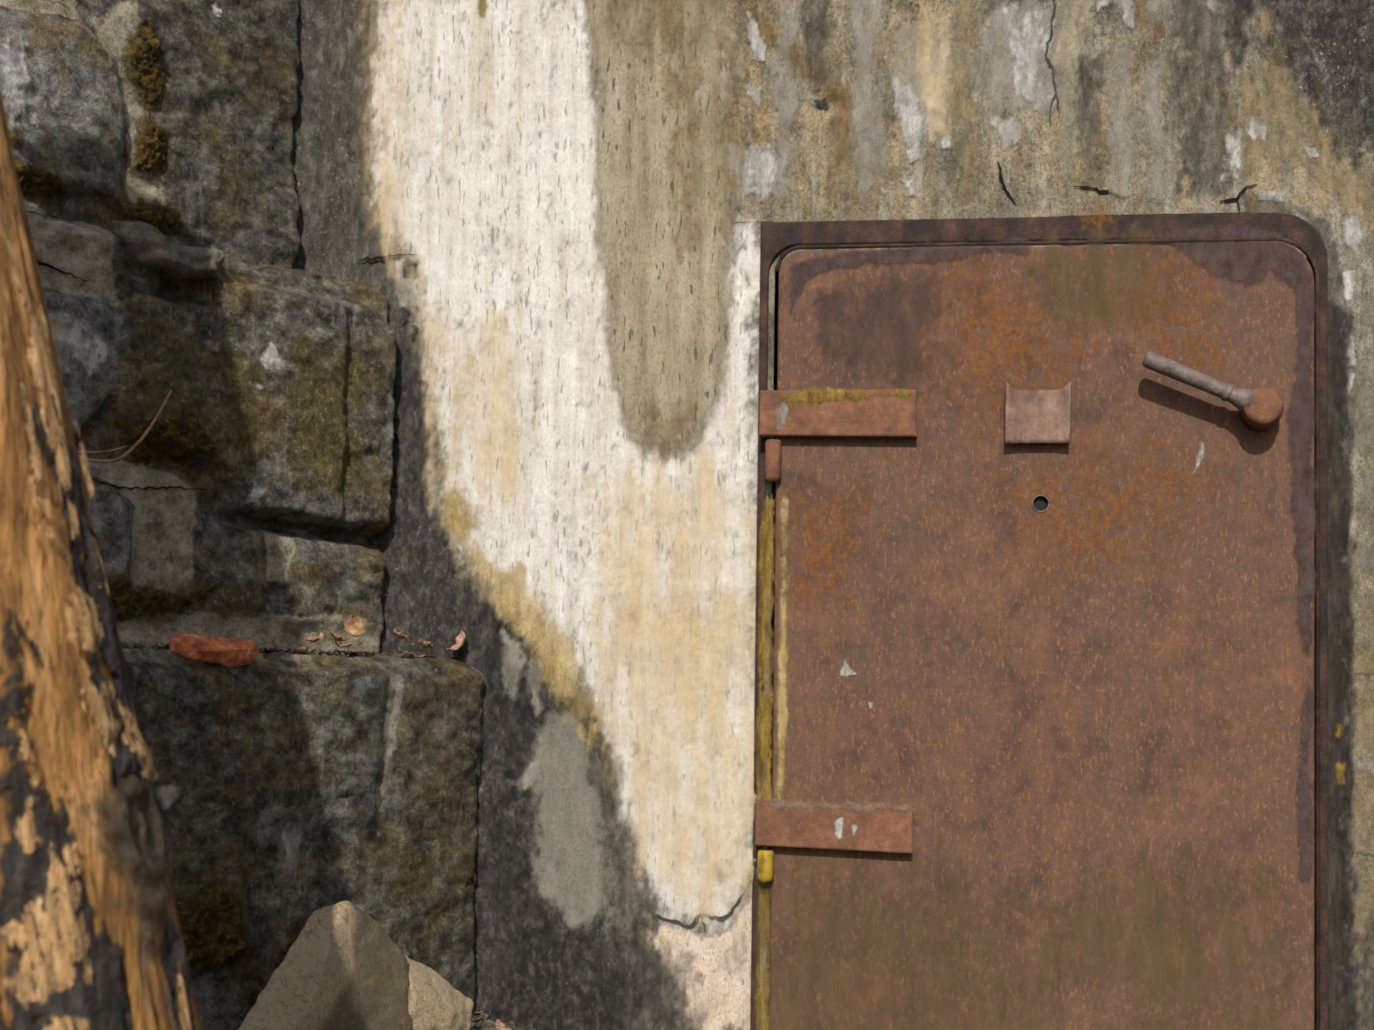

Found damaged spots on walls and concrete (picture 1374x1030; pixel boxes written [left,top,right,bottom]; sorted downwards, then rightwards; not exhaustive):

spalling [801,92,828,110]
leakage [830,0,978,203]
spalling [905,148,920,196]
crack [1045,0,1060,126]
peeling [977,0,1134,156]
leakage [1077,0,1255,200]
leakage [1272,0,1374,170]
leakage [297,0,829,1030]
rust [1015,453,1193,578]
leakage [1304,212,1374,1030]
leakage [281,822,301,887]
crack [651,879,752,932]